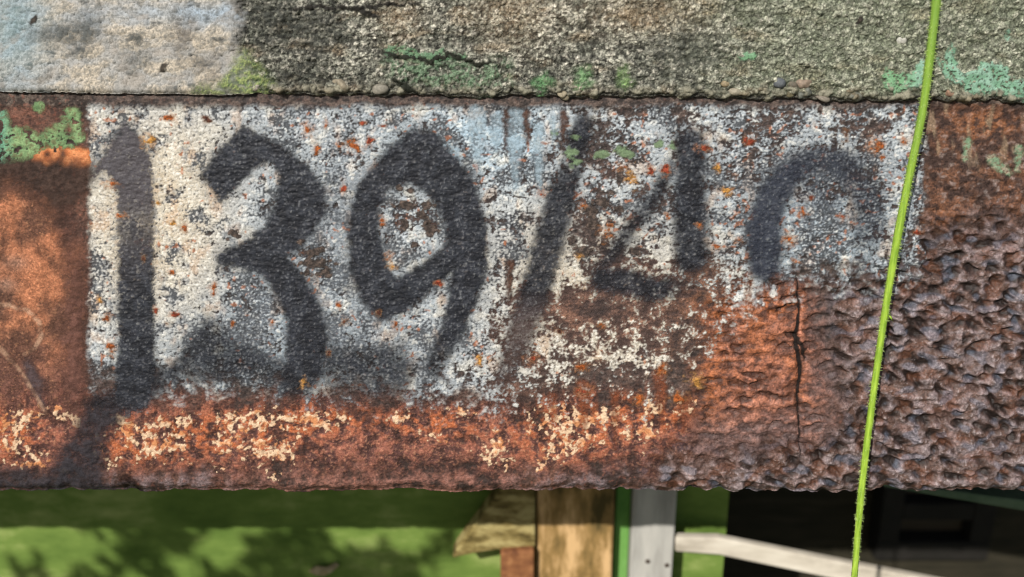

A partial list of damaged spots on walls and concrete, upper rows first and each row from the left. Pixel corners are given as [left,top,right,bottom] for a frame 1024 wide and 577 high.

peeling [0,77,1023,481]
corrosion [0,104,1024,493]
crack [792,275,806,457]